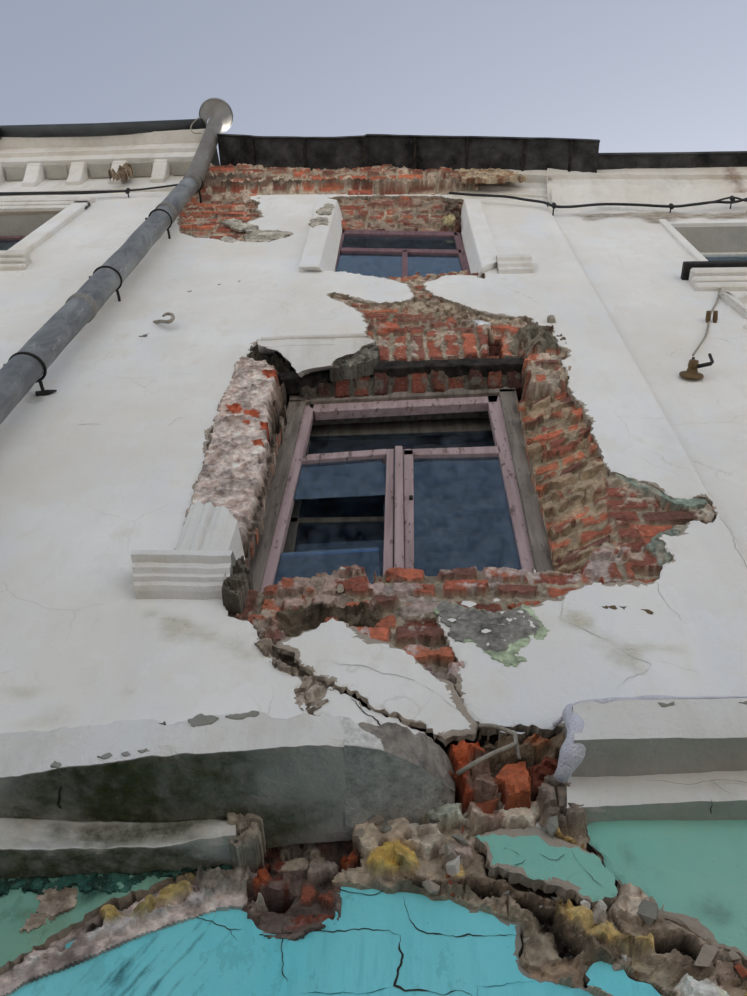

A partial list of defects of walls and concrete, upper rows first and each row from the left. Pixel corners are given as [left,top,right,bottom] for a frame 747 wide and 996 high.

flaking render [180,198,292,243]
peeling [308,203,335,228]
flaking render [183,345,287,569]
peeling [614,473,716,566]
peeling [433,587,550,667]
crack [254,634,484,754]
leakage [0,752,252,899]
flaking render [332,717,747,996]
flaking render [0,865,278,996]
crack [281,888,536,996]